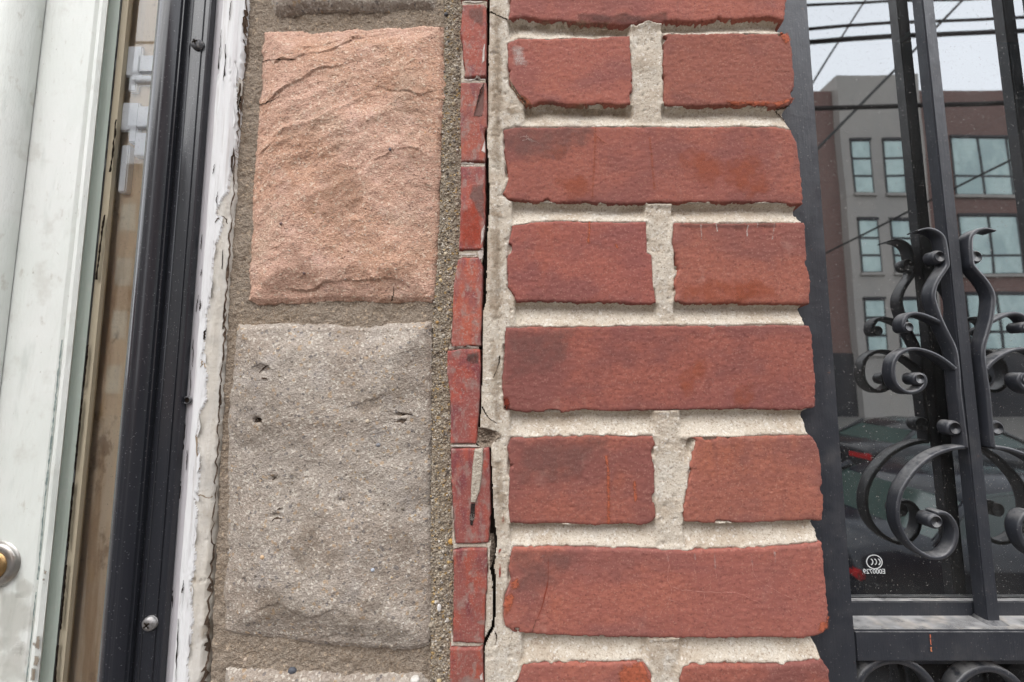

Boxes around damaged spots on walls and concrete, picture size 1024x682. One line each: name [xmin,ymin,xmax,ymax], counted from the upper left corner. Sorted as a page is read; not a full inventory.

crack [487,0,508,89]
peeling [186,147,239,682]
crack [476,134,500,660]